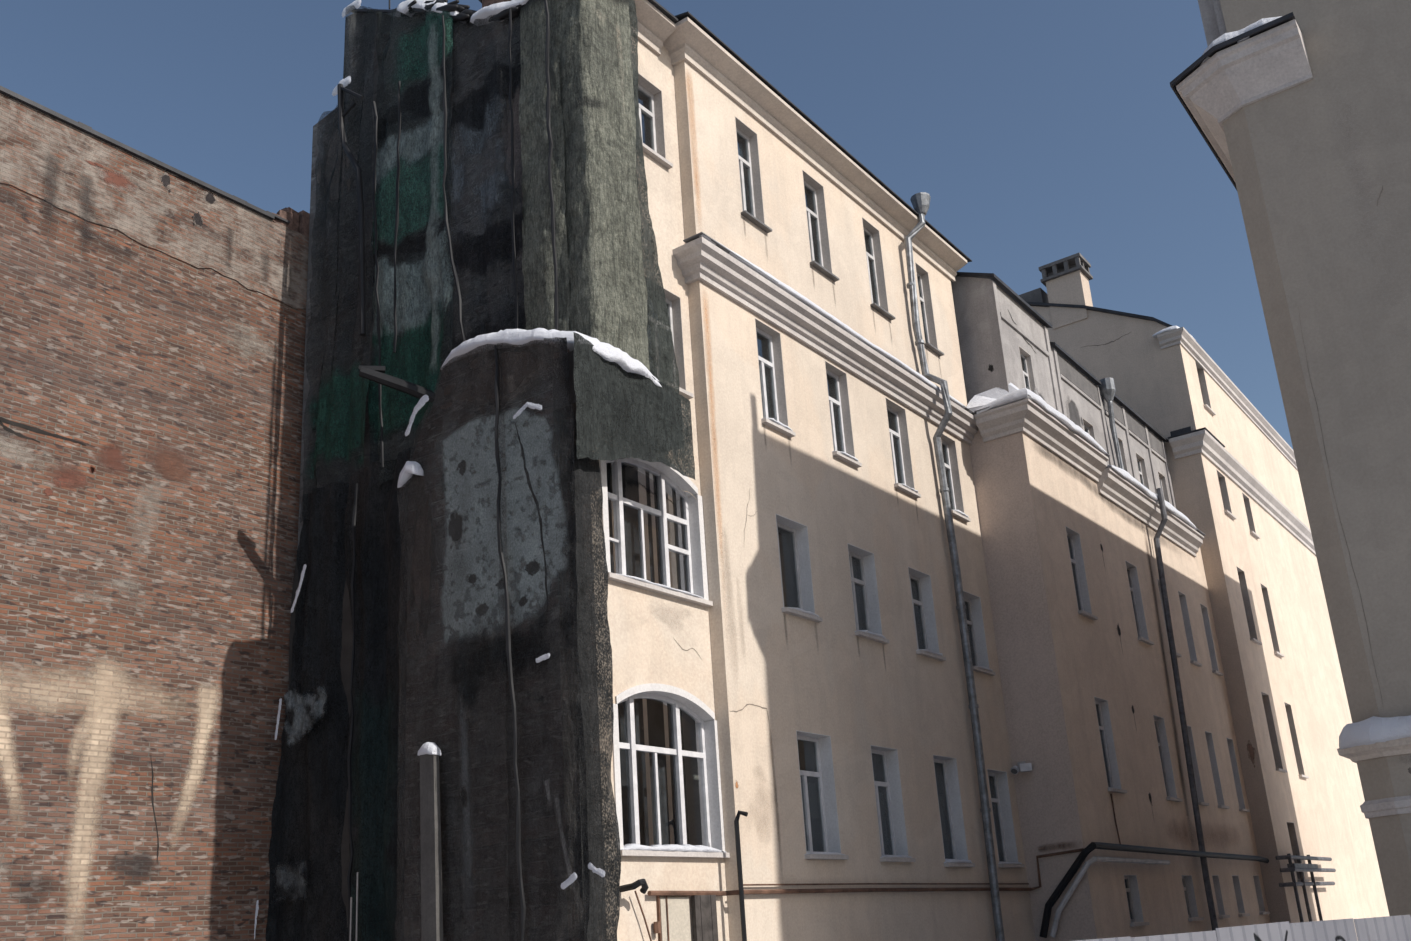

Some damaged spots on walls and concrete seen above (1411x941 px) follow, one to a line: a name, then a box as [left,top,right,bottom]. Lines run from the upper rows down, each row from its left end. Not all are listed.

crack [0,417,86,446]